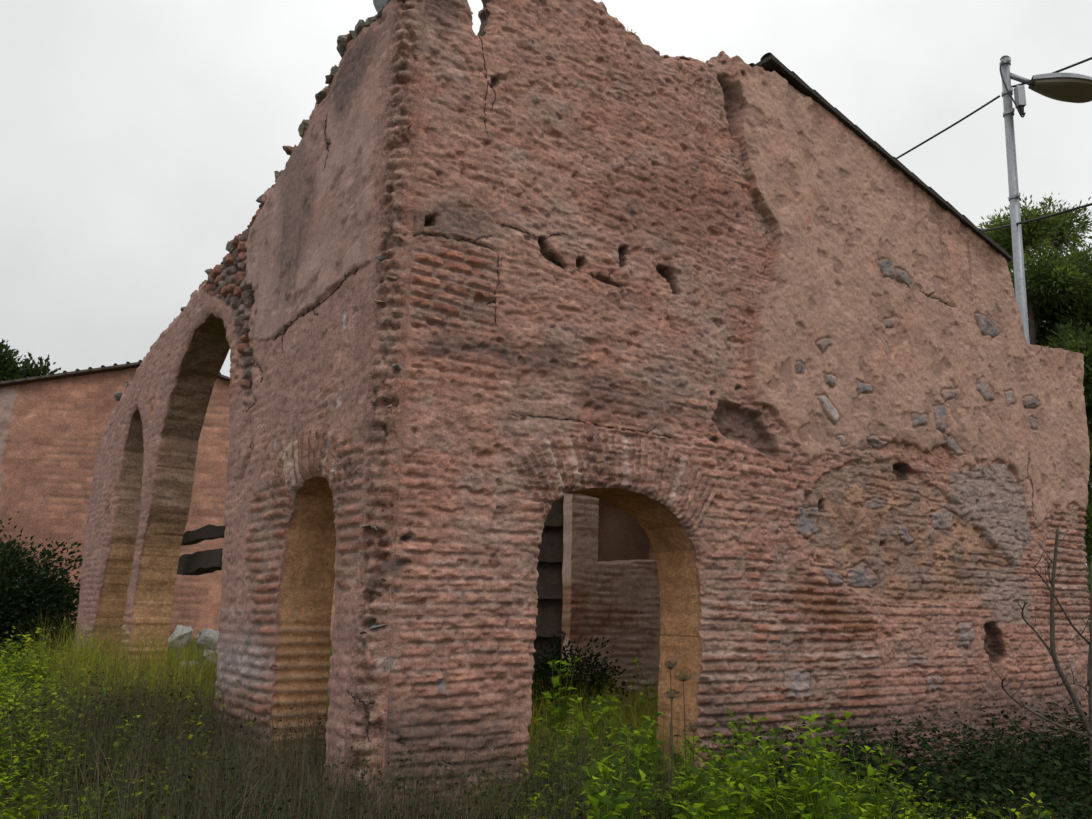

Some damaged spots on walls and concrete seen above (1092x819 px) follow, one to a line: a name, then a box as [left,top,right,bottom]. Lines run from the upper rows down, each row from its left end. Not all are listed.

crack [479,37,496,144]
spalling [538,236,587,270]
spalling [618,246,629,269]
crack [396,224,626,326]
spalling [595,273,623,289]
spalling [656,264,680,295]
crack [274,268,358,352]
crack [246,359,263,450]
crack [510,414,676,438]